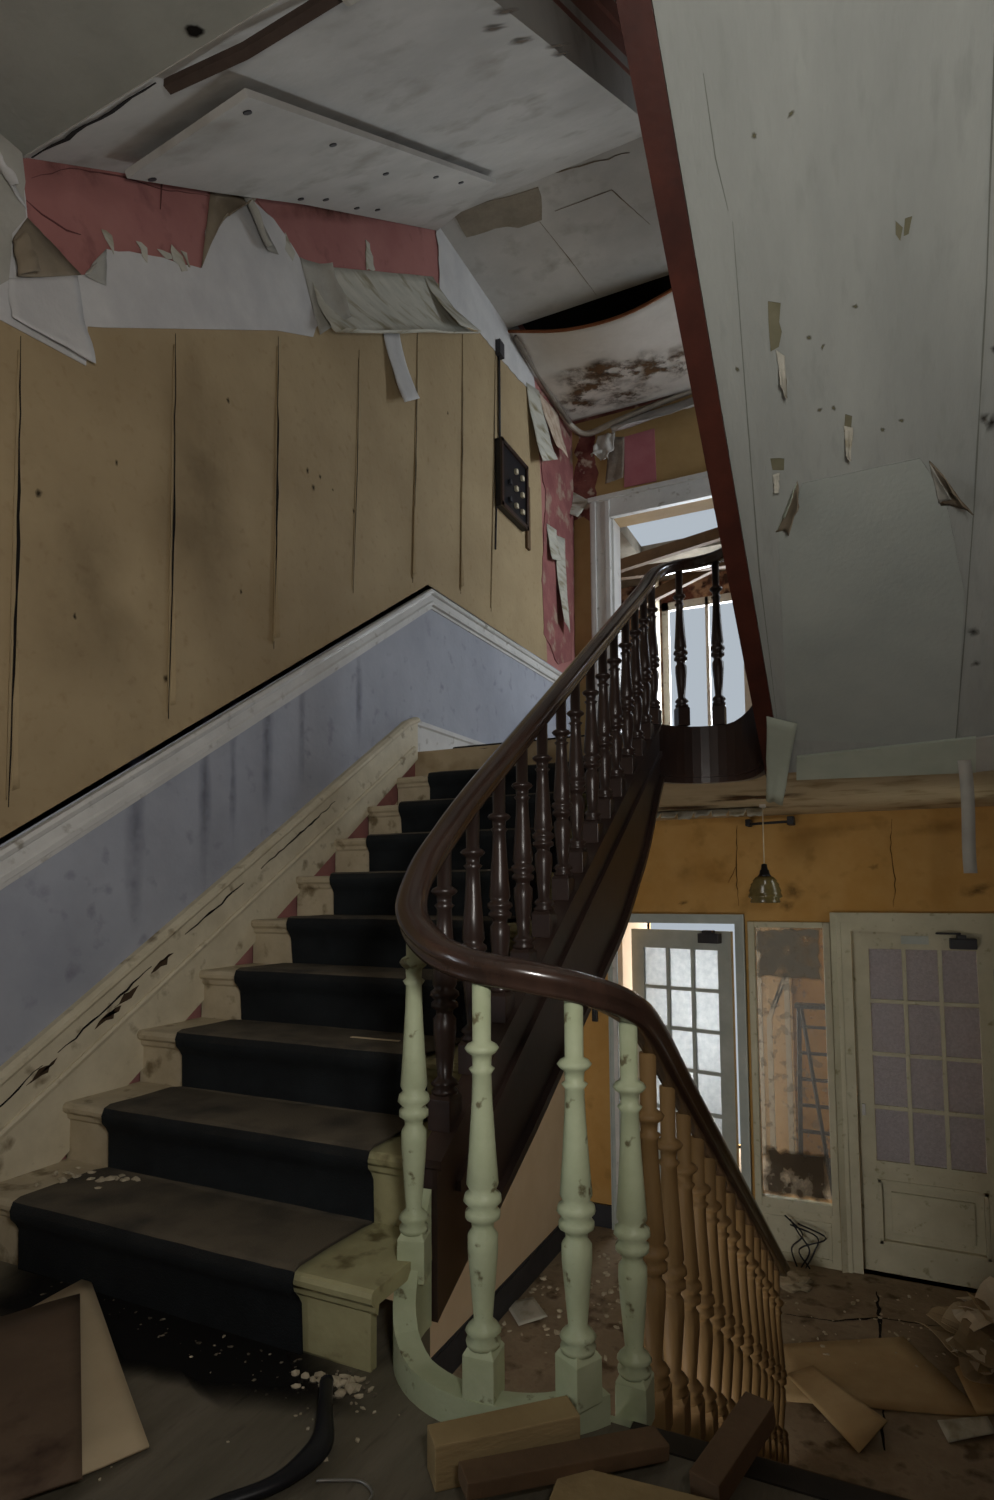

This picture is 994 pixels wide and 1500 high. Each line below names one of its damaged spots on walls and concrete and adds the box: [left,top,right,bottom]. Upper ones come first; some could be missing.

peeling [23,158,210,275]
peeling [256,198,435,279]
spalling [455,187,647,293]
peeling [896,216,912,240]
water stain [562,351,685,410]
peeling [768,301,788,400]
peeling [526,382,656,665]
peeling [770,458,784,494]
peeling [818,406,853,462]
crack [0,801,335,1107]